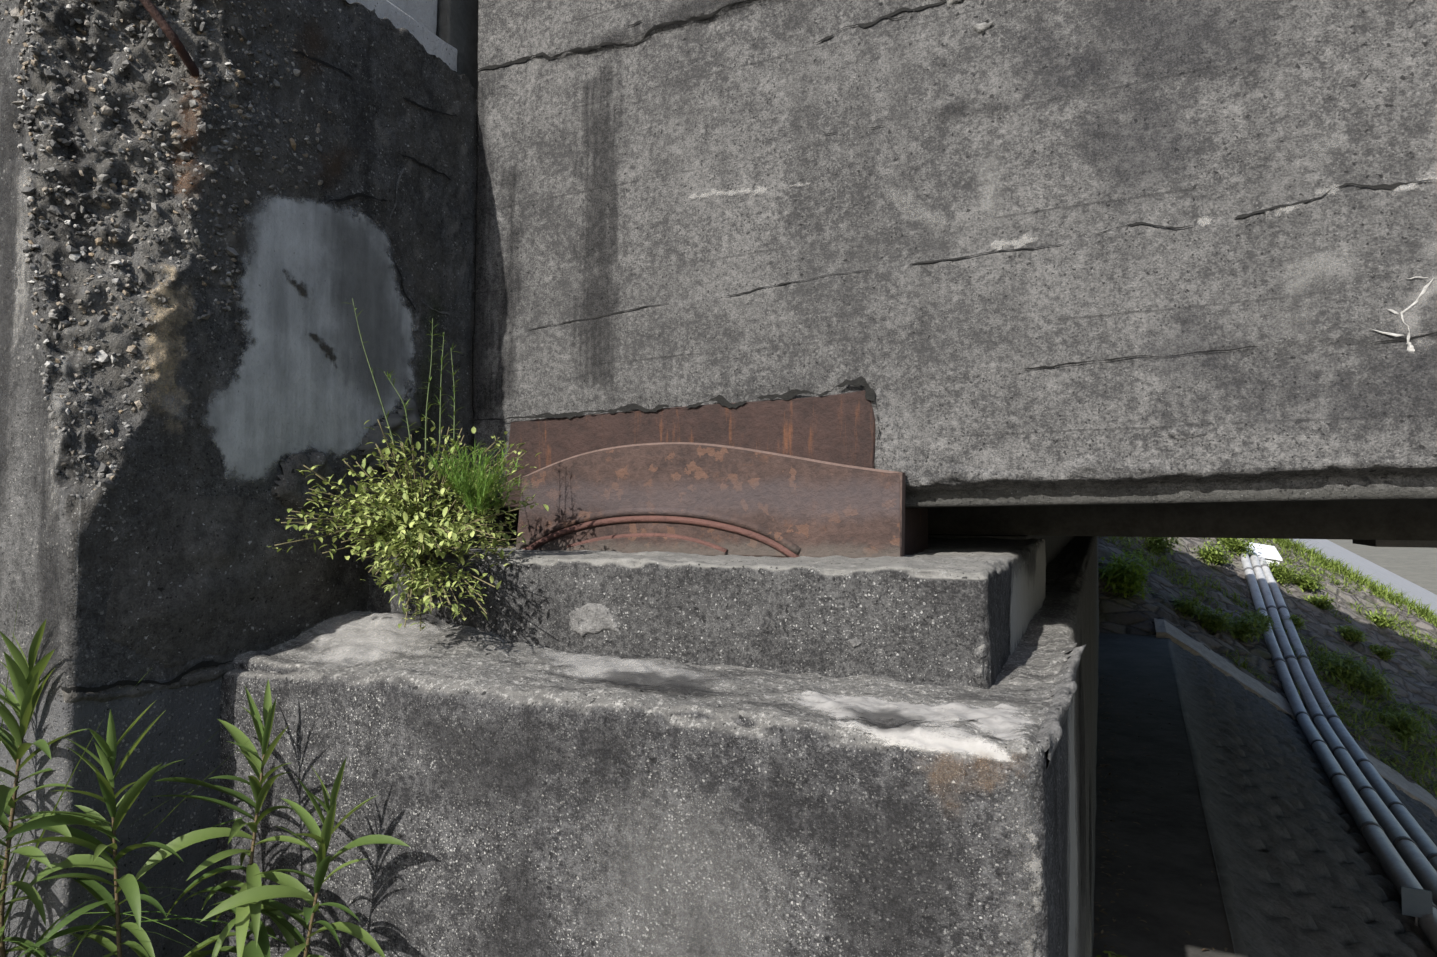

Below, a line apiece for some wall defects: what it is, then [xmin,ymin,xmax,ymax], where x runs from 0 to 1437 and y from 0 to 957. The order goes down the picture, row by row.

crack [477,0,757,71]
crack [1234,180,1429,219]
spalling [0,0,342,499]
crack [711,222,1193,298]
crack [529,303,667,330]
crack [1019,346,1260,370]
crack [1370,332,1437,344]
spalling [358,398,421,474]
spalling [271,452,338,513]
crack [61,658,237,703]
damp [1068,696,1091,957]